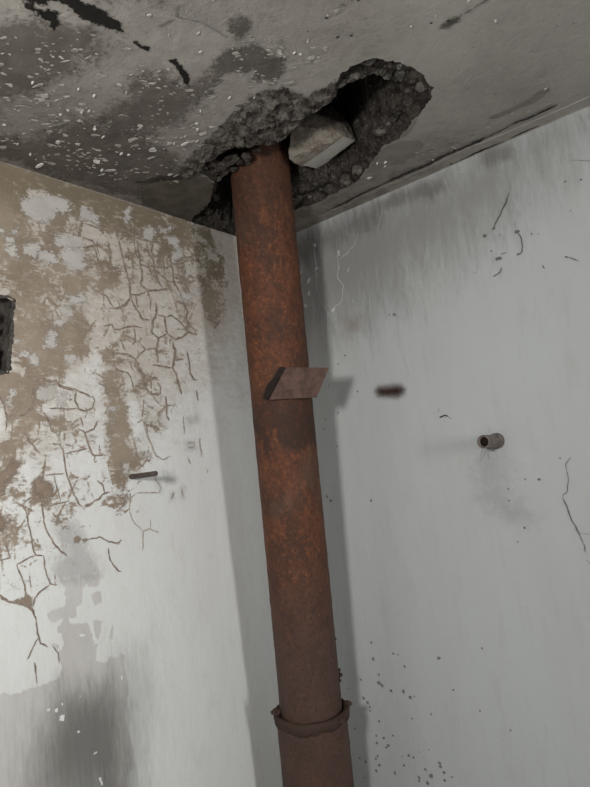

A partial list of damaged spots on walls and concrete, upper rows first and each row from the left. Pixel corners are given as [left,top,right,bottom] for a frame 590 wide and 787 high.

crack [0,374,110,683]
crack [86,536,122,572]
crack [82,222,208,473]
crack [129,478,183,549]
peeling [0,0,434,787]
crack [562,457,590,563]